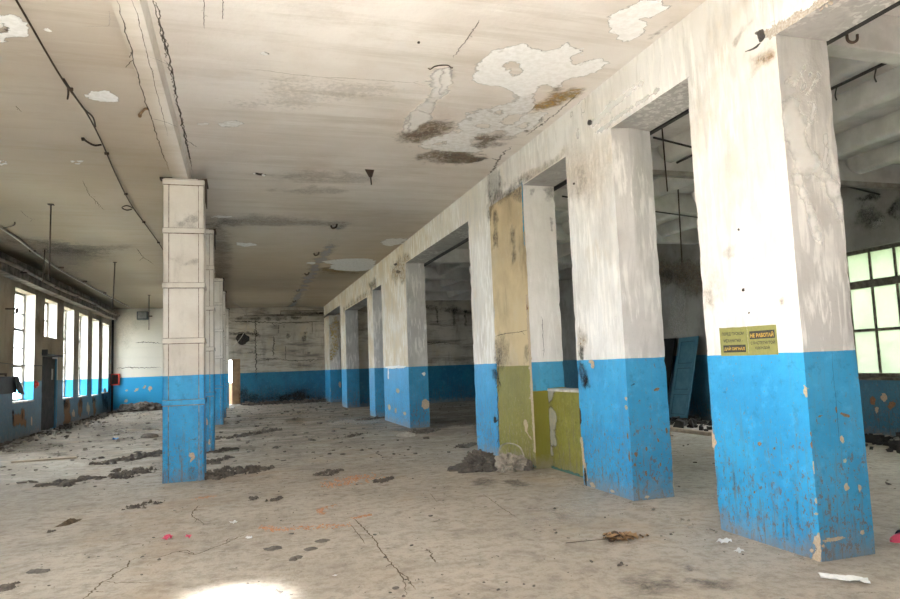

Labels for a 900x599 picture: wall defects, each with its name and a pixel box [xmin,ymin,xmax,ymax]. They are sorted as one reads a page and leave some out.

peeling [0,14,29,43]
peeling [608,0,669,42]
peeling [84,90,119,102]
damp [403,68,452,142]
peeling [419,43,609,153]
damp [416,136,502,163]
peeling [548,391,595,488]
crack [83,533,248,599]
crack [351,520,414,593]
flaking render [810,532,849,562]